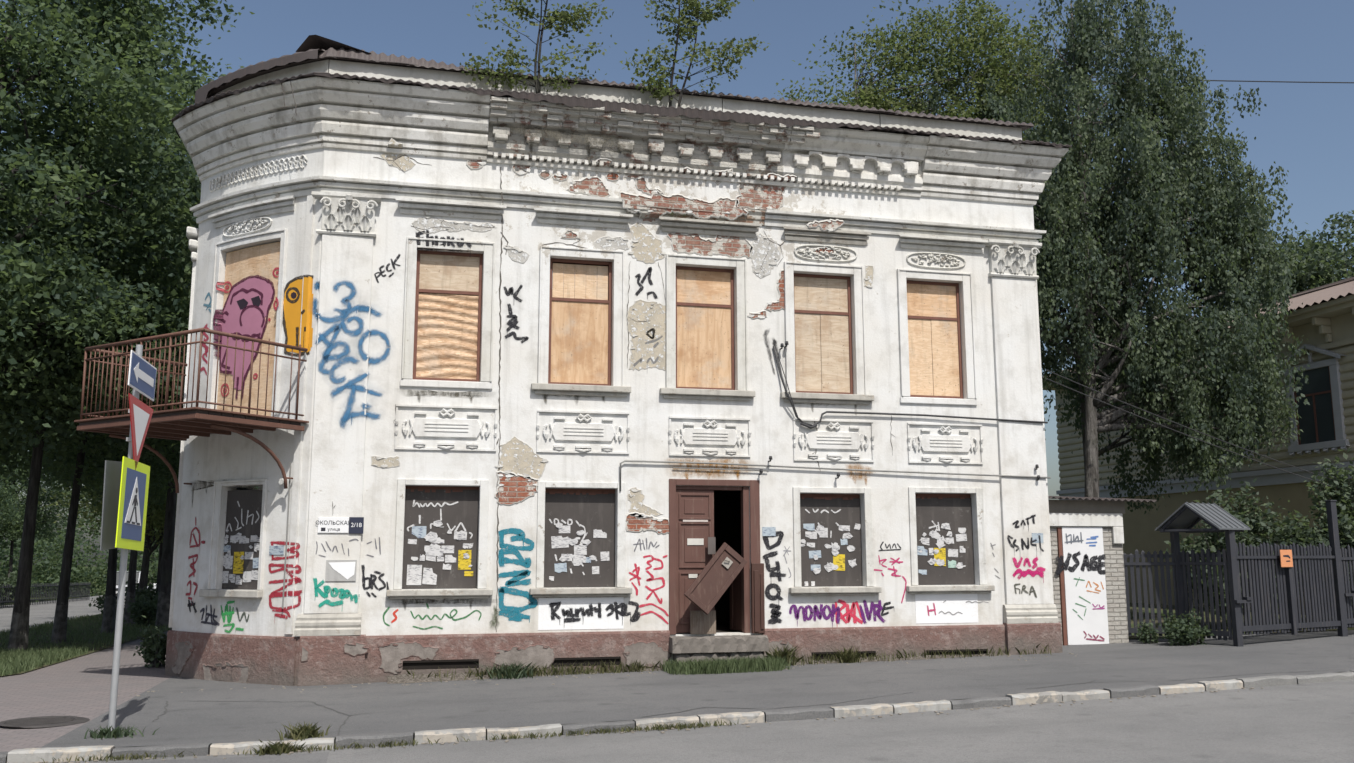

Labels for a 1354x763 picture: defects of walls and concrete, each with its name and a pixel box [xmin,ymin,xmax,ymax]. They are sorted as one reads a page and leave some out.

spalling [511,155,798,320]
peeling [626,299,666,371]
peeling [494,436,548,506]
spalling [626,487,669,535]
peeling [343,641,439,675]